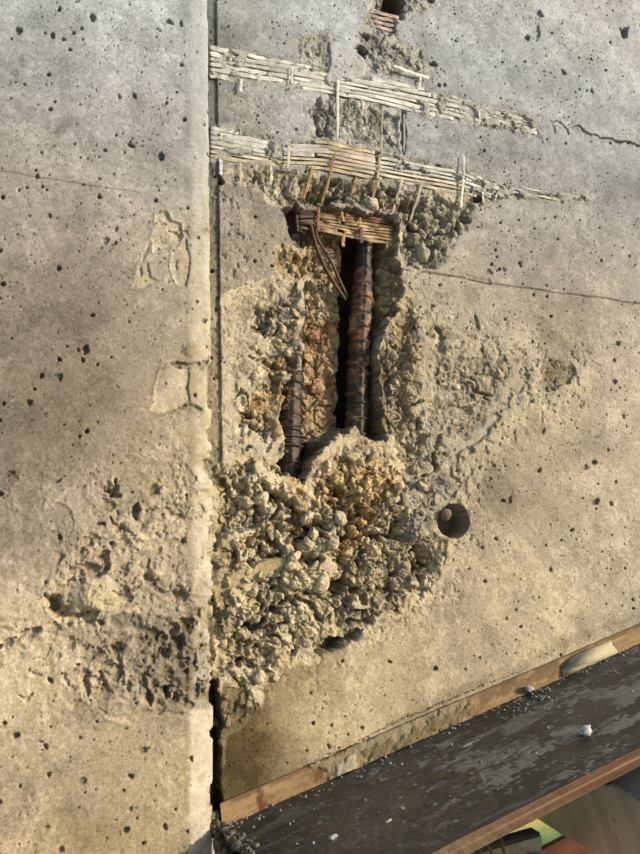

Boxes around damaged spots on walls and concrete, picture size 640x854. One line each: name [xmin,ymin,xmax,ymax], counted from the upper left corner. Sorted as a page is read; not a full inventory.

spalling [208,0,544,188]
crack [545,117,640,150]
crack [403,269,640,306]
spalling [37,142,600,783]
spalling [0,622,45,651]
spalling [27,666,45,678]
spalling [17,690,35,705]